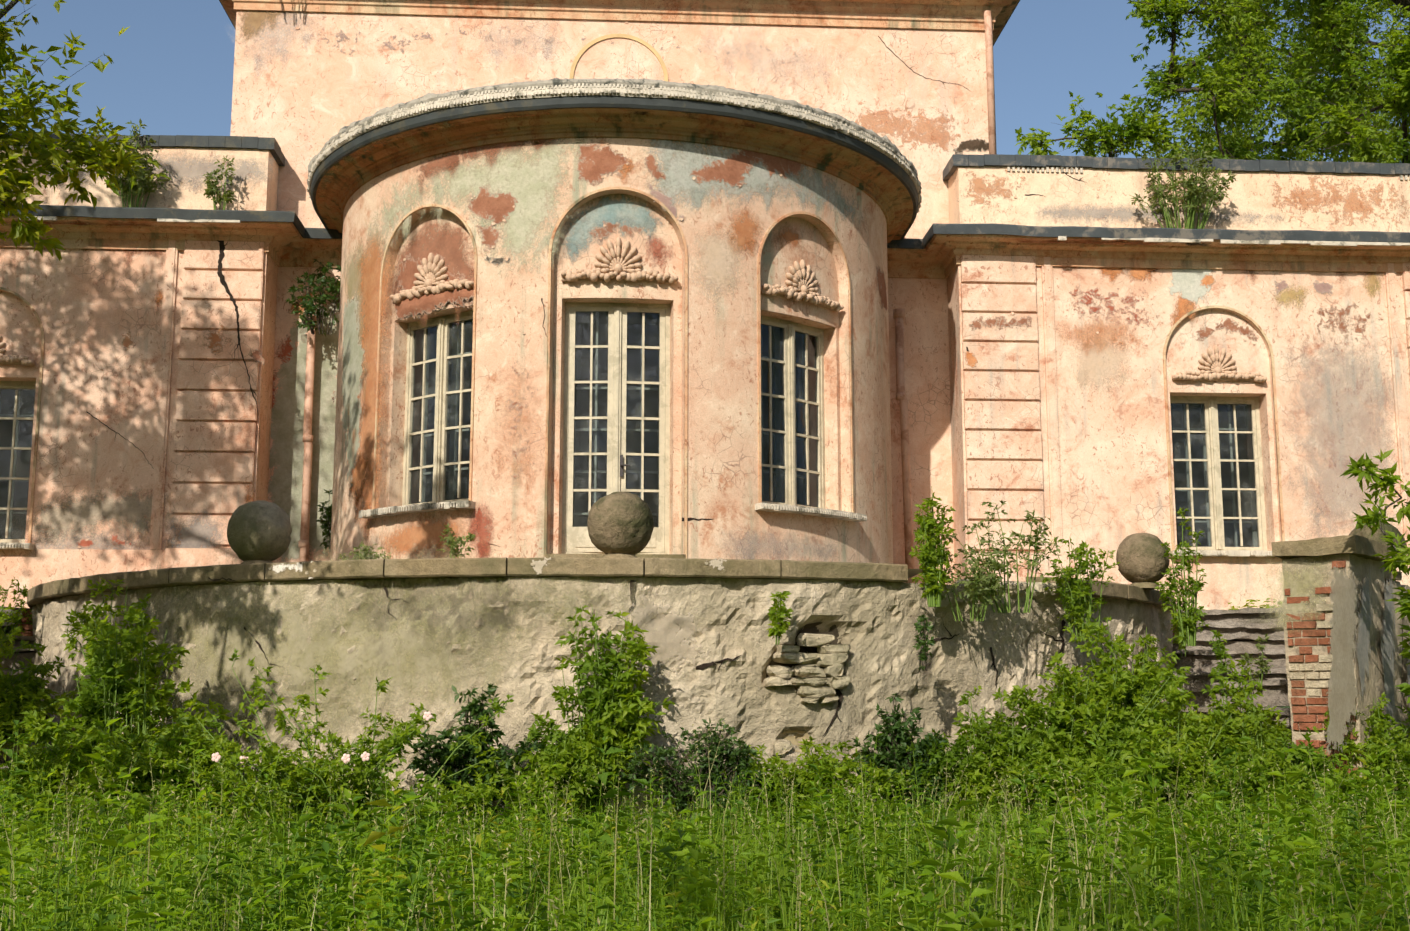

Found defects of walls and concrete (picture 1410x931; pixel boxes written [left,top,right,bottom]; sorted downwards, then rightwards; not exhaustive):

flaking render [576,139,684,222]
flaking render [690,149,805,189]
crack [217,240,260,439]
peeling [1069,284,1165,337]
flaking render [1168,269,1216,304]
peeling [1196,317,1259,345]
peeling [1274,279,1289,294]
peeling [1313,280,1384,344]
spalling [616,585,709,683]
spalling [763,622,851,703]
spalling [1284,561,1410,777]
spalling [772,730,810,755]